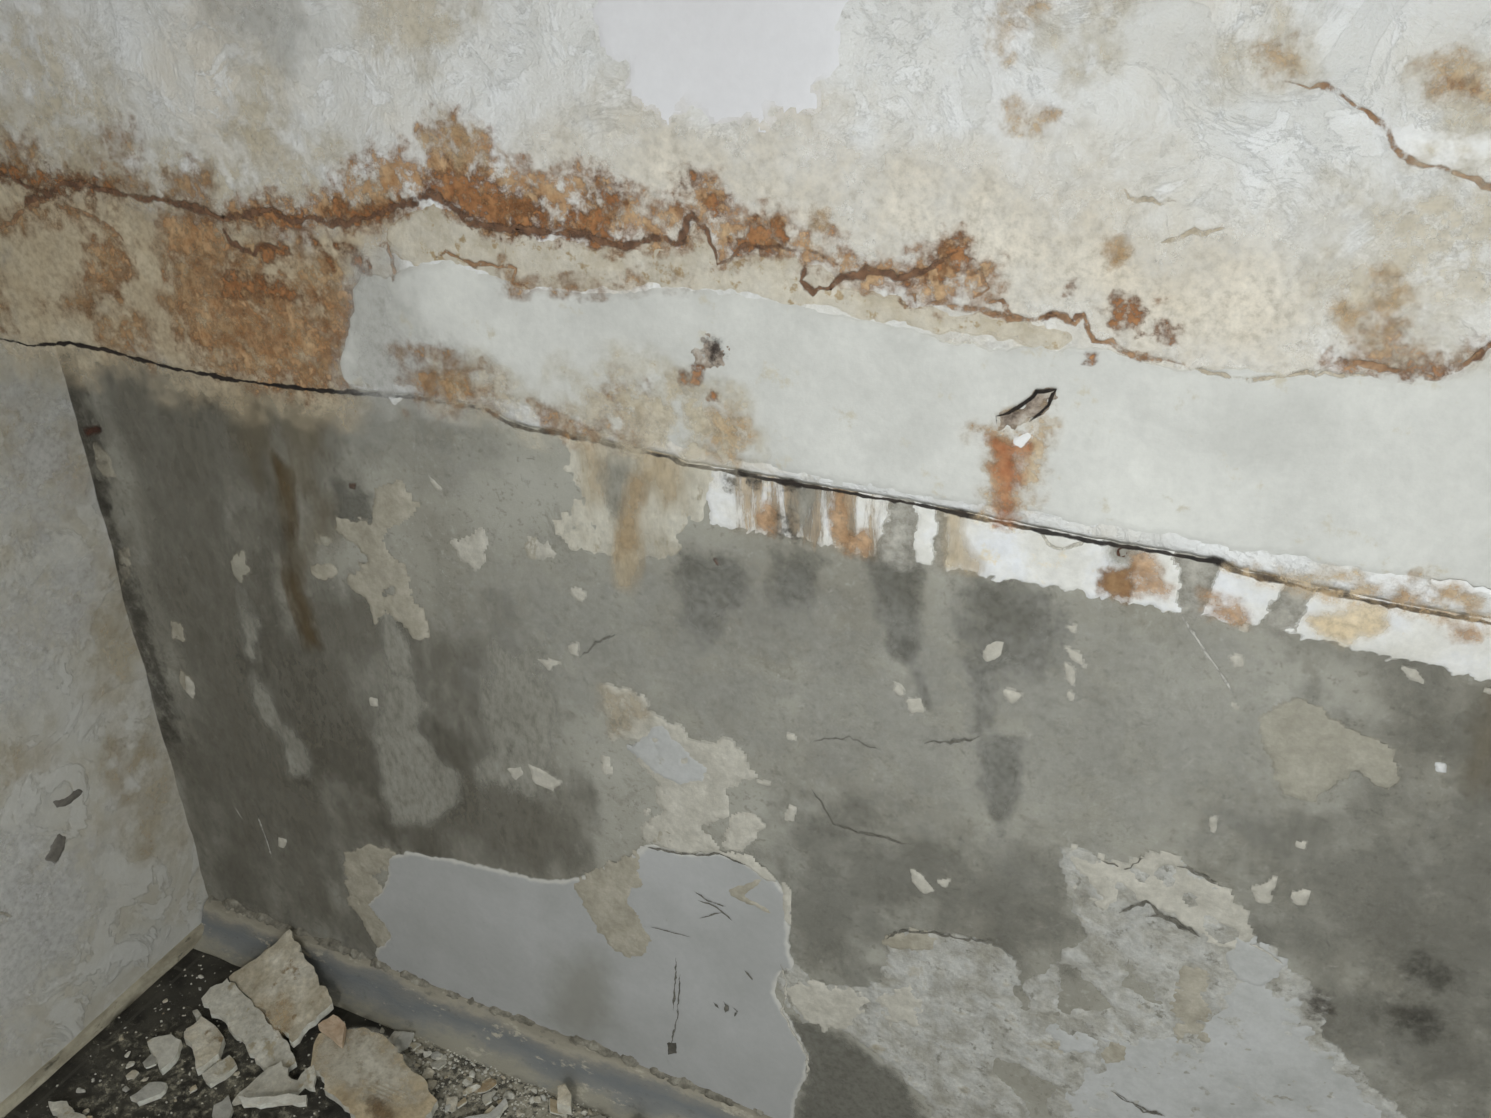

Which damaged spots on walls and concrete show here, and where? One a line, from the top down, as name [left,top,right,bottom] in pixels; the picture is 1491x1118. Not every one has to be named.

damp [0,112,579,949]
rust [0,108,1003,395]
flaking render [678,333,730,386]
crack [0,339,1491,625]
rust [735,474,877,558]
damp [617,126,1308,364]
damp [948,509,1056,820]
flaking render [971,388,1058,530]
rust [1097,553,1168,602]
crack [1289,81,1491,191]
peeling [574,682,791,959]
peeling [776,843,1410,1118]